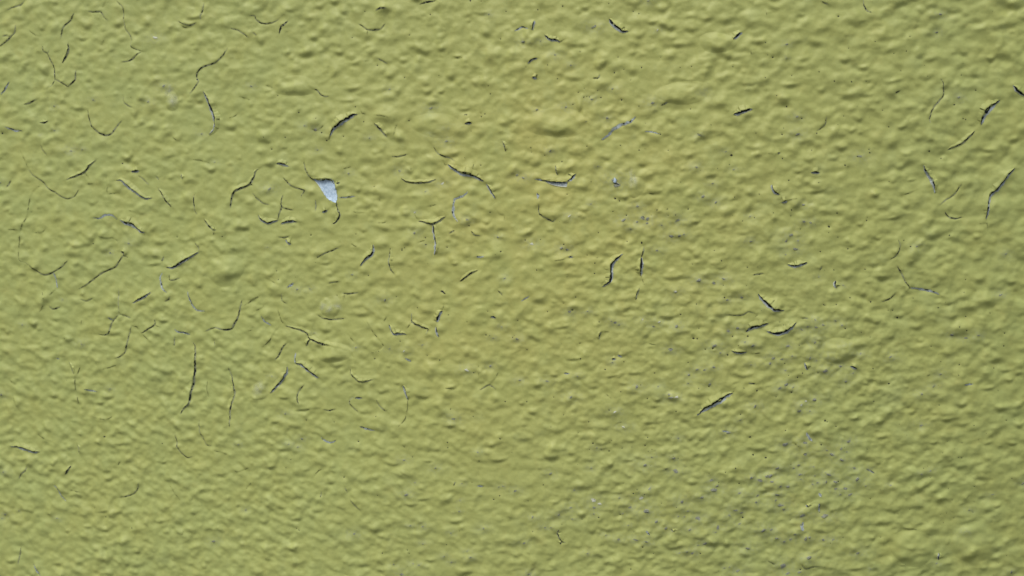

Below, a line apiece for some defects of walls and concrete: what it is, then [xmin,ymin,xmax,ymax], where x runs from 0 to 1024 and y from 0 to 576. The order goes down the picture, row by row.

crack [929,79,944,123]
crack [948,85,1024,150]
peeling [304,164,341,224]
crack [536,166,576,222]
crack [904,165,1015,228]
crack [0,2,496,458]
crack [602,248,644,300]
crack [732,273,807,354]
crack [697,383,755,432]